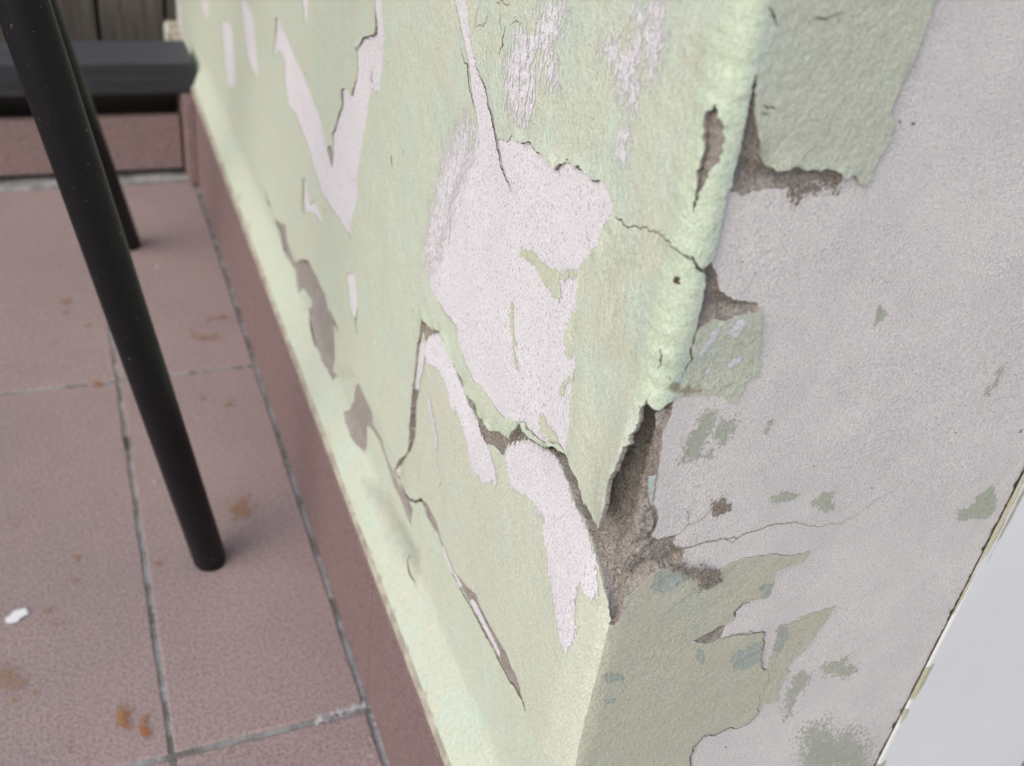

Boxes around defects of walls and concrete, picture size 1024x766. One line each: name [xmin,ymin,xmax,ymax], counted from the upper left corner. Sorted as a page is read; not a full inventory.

peeling [274,0,384,234]
spalling [700,111,725,191]
spalling [729,92,842,196]
spalling [276,220,336,380]
peeling [428,0,613,455]
crack [616,217,711,273]
spalling [697,264,758,326]
spalling [345,384,412,522]
spalling [600,404,689,622]
spalling [708,495,732,517]
crack [675,483,909,549]
crack [452,574,526,711]